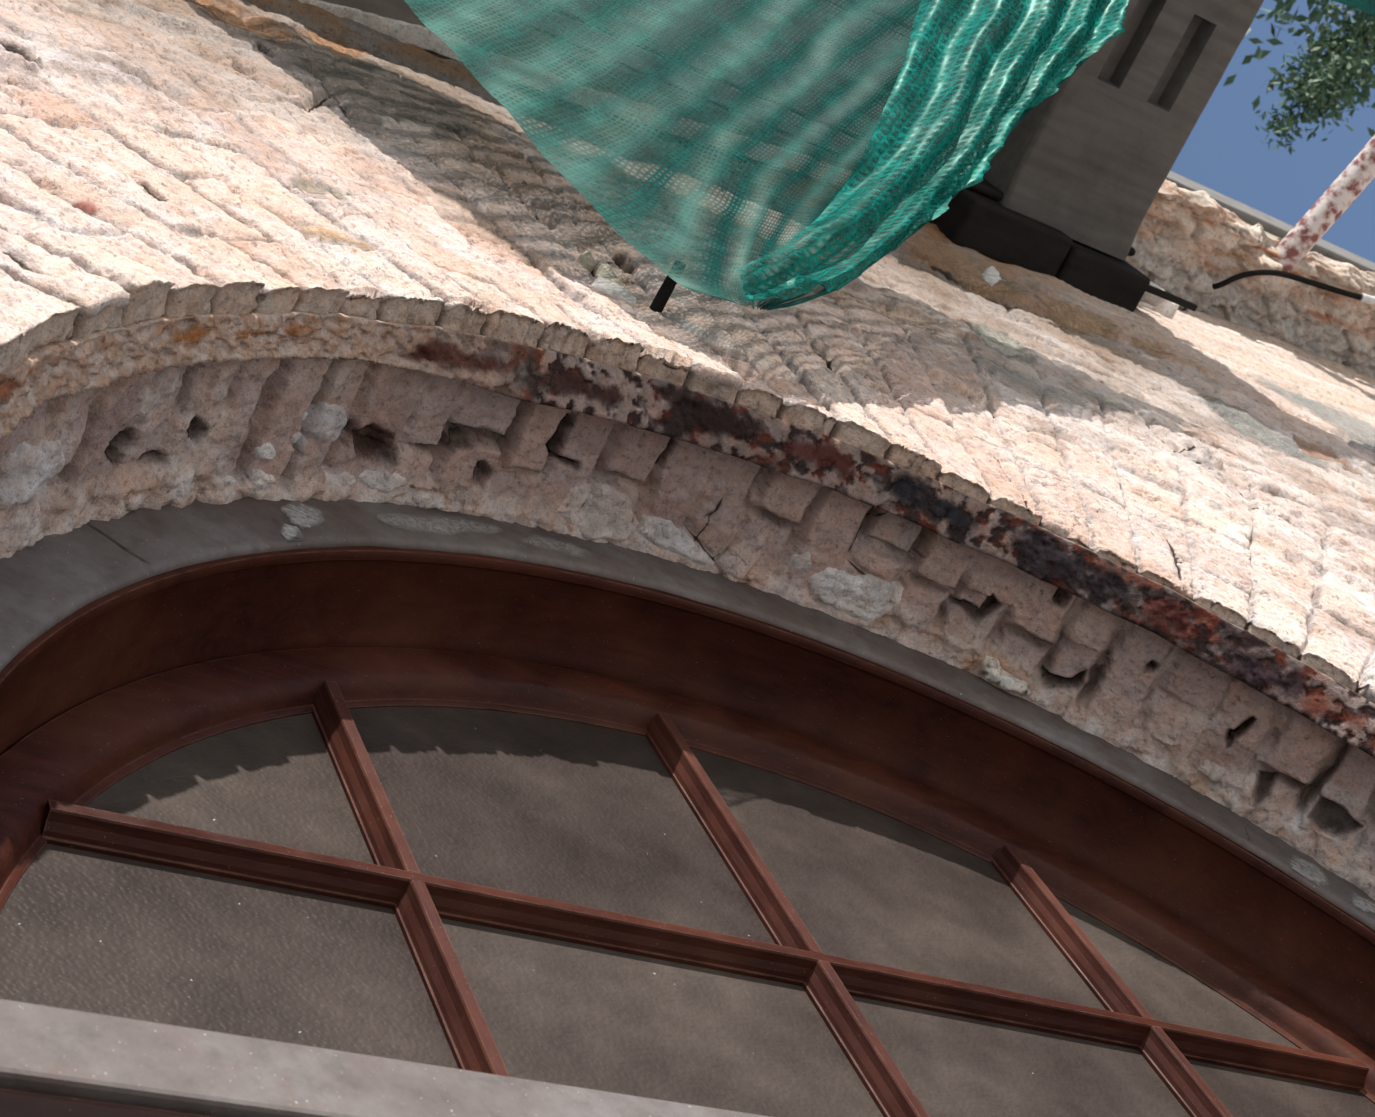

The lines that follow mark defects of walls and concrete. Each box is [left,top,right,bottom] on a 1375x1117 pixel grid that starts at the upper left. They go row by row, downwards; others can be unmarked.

crack [308,84,355,122]
corrosion [399,338,506,372]
corrosion [538,369,624,404]
corrosion [654,386,762,438]
corrosion [781,439,855,480]
corrosion [890,477,977,531]
corrosion [1012,527,1202,640]
corrosion [1222,642,1375,746]